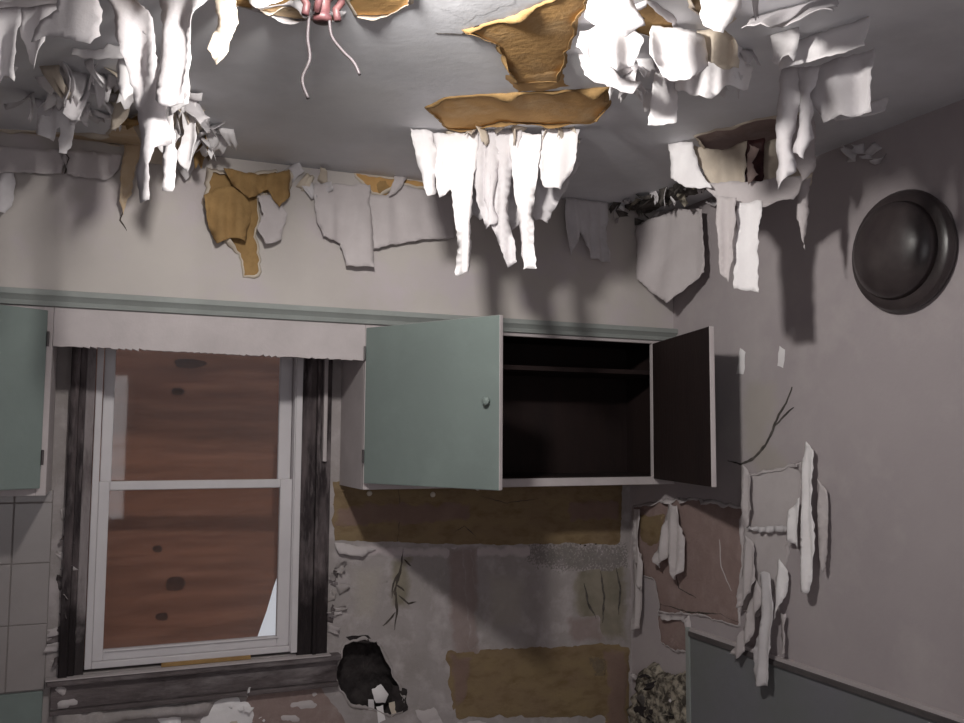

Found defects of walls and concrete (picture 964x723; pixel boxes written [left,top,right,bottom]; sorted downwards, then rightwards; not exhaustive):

peeling [0,0,315,215]
peeling [204,0,889,303]
crack [729,387,794,465]
peeling [631,504,685,631]
peeling [730,442,828,686]